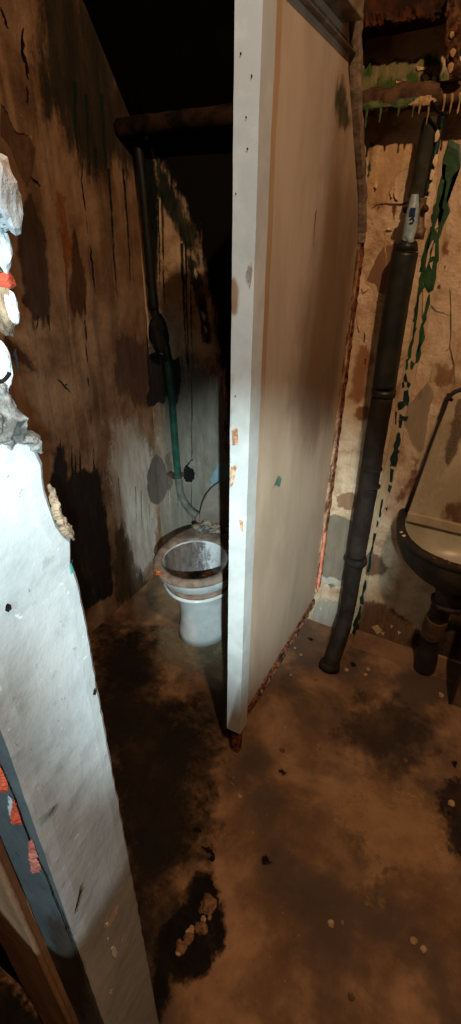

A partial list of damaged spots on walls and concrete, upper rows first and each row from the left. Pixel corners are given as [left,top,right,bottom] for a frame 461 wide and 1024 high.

crack [0,7,29,104]
spalling [0,104,43,454]
damp [17,194,51,331]
damp [49,440,149,610]
damp [36,0,230,545]
peeling [350,129,461,636]